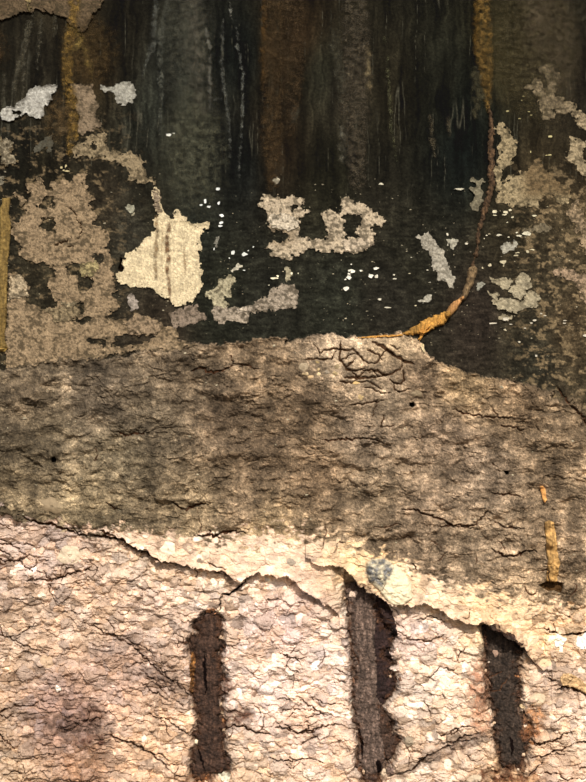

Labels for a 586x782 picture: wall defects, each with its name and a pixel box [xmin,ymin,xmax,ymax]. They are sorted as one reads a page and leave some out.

flaking render [518,64,586,176]
flaking render [469,122,586,256]
flaking render [0,81,386,369]
peeling [476,272,547,329]
flaking render [551,266,586,304]
crack [0,539,98,585]
crack [25,517,190,568]
crack [194,530,245,538]
crack [209,563,250,610]
spalling [0,497,586,782]
crack [544,627,586,635]
corrosion [183,611,252,782]